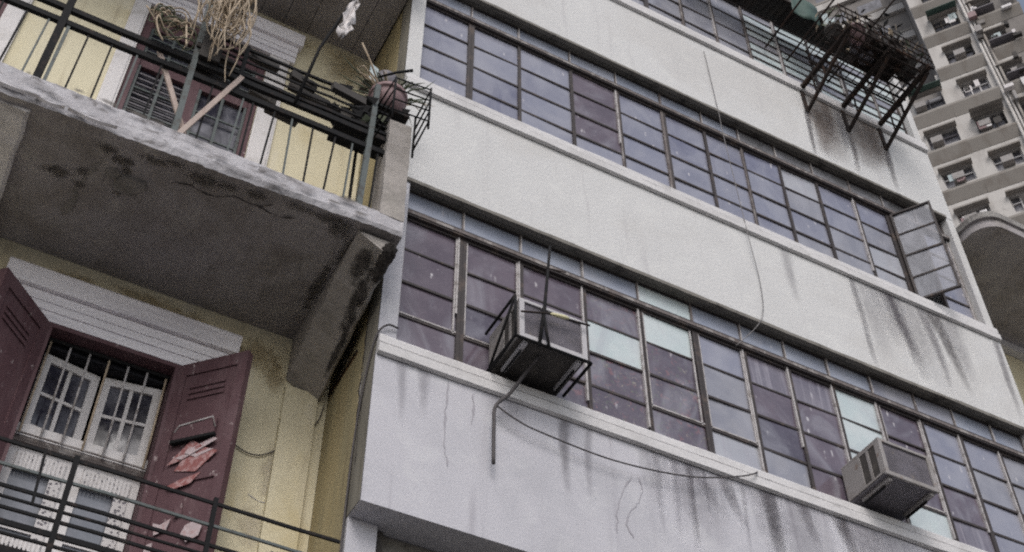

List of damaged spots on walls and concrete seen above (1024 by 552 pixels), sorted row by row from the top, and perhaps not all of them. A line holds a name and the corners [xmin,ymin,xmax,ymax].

water stain [806,97,891,168]
water stain [333,331,358,384]
water stain [928,311,955,358]
crack [444,382,475,466]
crack [616,476,643,538]
water stain [763,490,778,530]